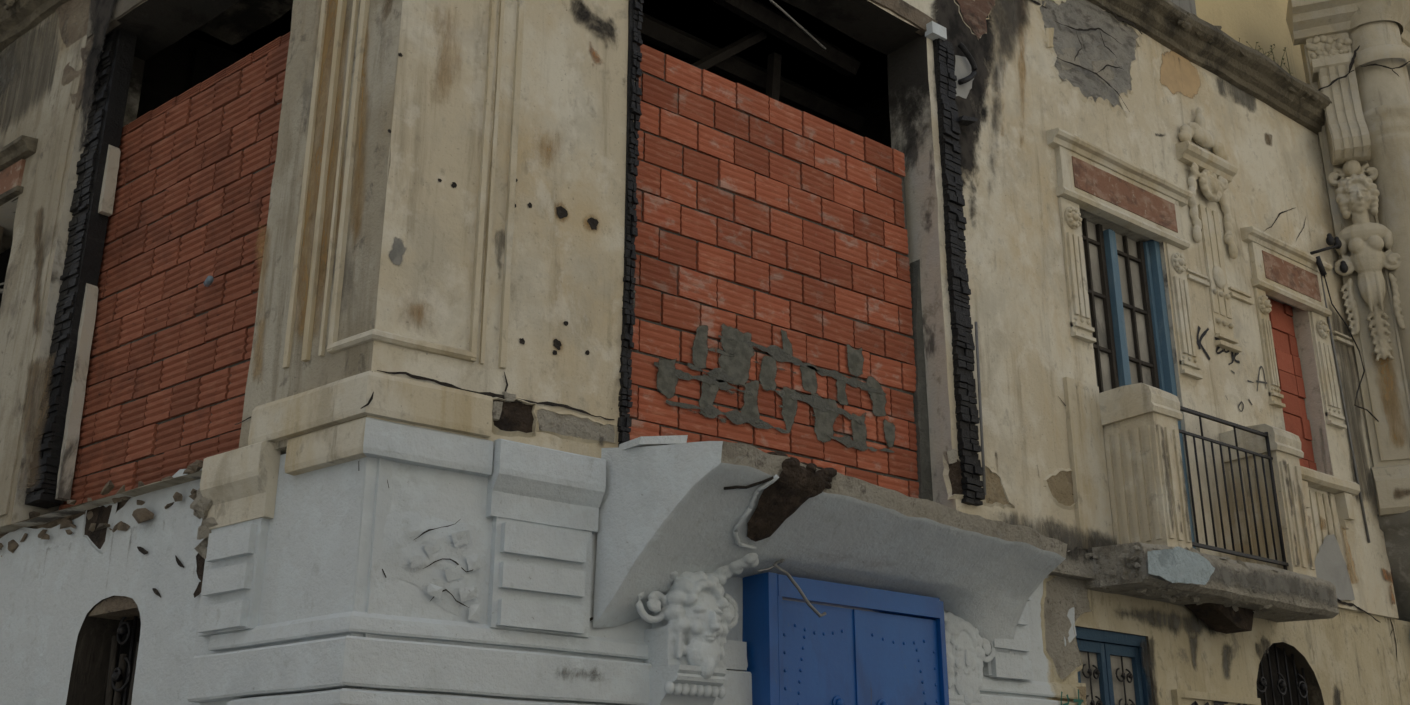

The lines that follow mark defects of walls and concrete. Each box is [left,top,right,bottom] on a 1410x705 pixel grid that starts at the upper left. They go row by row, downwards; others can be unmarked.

spalling [954,0,995,40]
spalling [955,55,974,99]
spalling [1030,0,1140,118]
peeling [1160,50,1200,98]
crack [360,370,614,420]
spalling [83,502,118,554]
spalling [190,488,218,559]
spalling [733,452,837,551]
spalling [1043,468,1075,510]
spalling [1040,575,1093,705]
spalling [1184,603,1255,634]